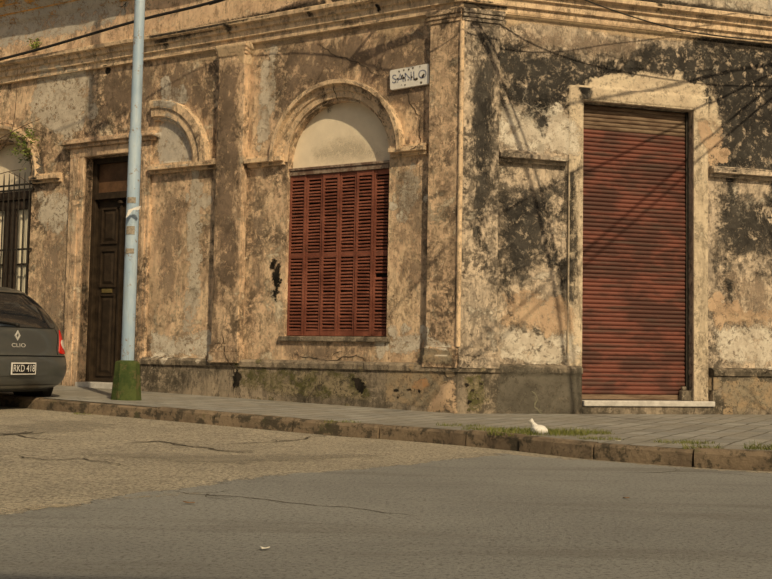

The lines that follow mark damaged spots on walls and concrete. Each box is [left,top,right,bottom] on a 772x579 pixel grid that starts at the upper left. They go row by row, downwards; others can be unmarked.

peeling [0,0,129,49]
damp [468,29,772,312]
peeling [497,290,581,366]
peeling [708,292,772,370]
spalling [706,376,772,415]
crack [0,425,121,465]
crack [134,435,325,453]